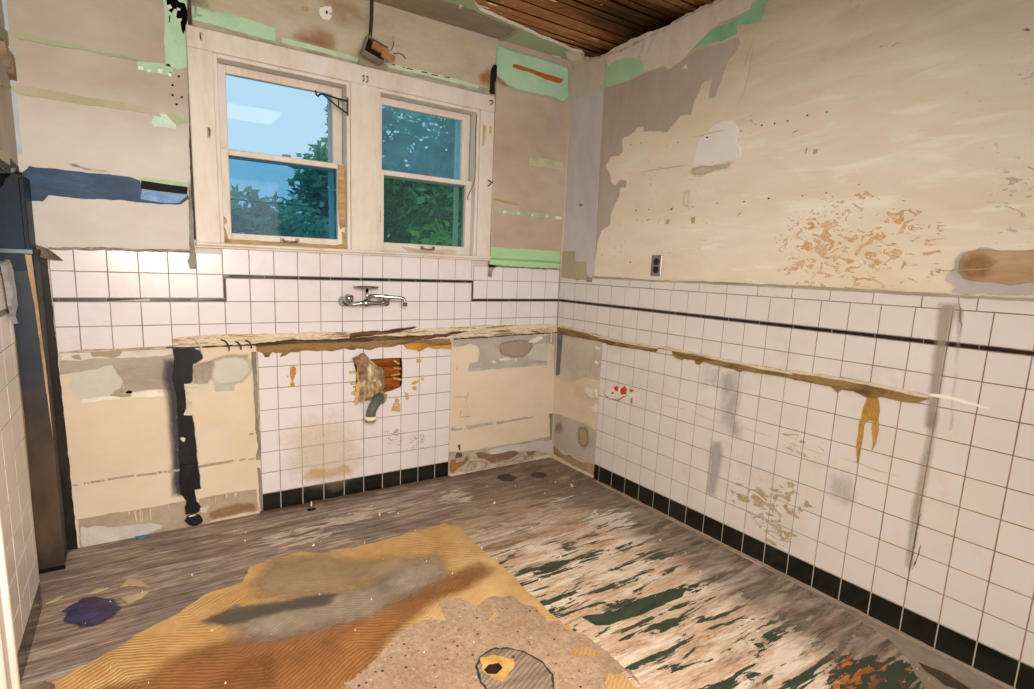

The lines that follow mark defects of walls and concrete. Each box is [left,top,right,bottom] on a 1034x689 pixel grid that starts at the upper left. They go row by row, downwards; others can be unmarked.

peeling [553,0,755,72]
peeling [137,62,175,77]
peeling [151,114,176,129]
peeling [779,191,942,288]
flaking render [61,349,173,361]
peeling [184,383,214,415]
peeling [448,414,597,475]
flaking render [78,489,259,548]